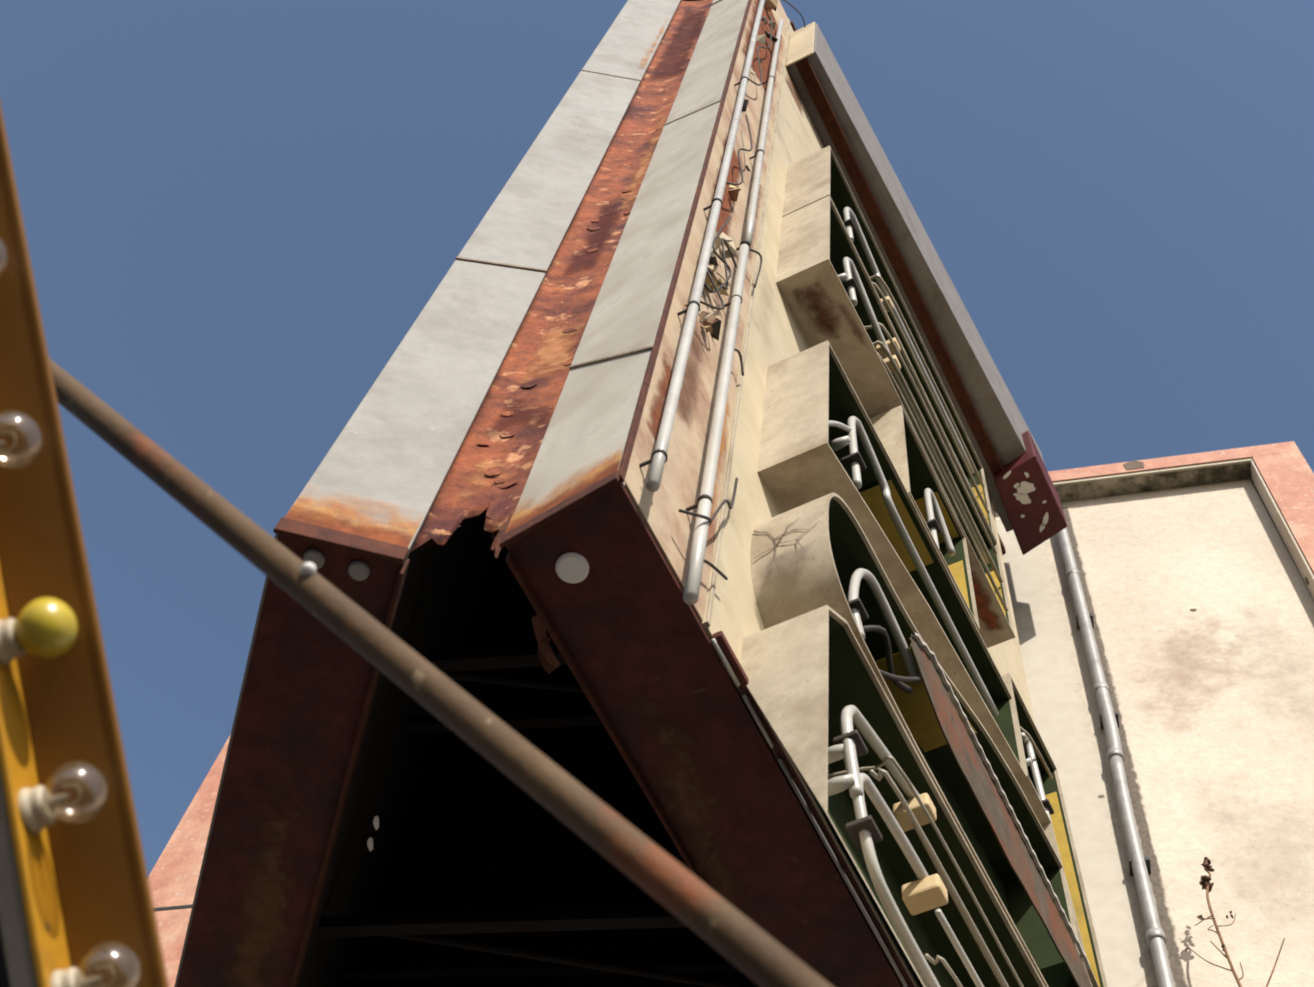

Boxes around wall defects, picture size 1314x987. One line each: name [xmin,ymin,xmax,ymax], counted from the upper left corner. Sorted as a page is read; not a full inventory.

rust [643,11,706,78]
rust [568,117,668,272]
rust [522,324,584,388]
rust [648,336,701,441]
rust [477,406,550,445]
rust [284,498,420,547]
rust [504,451,623,535]
crack [753,518,819,570]